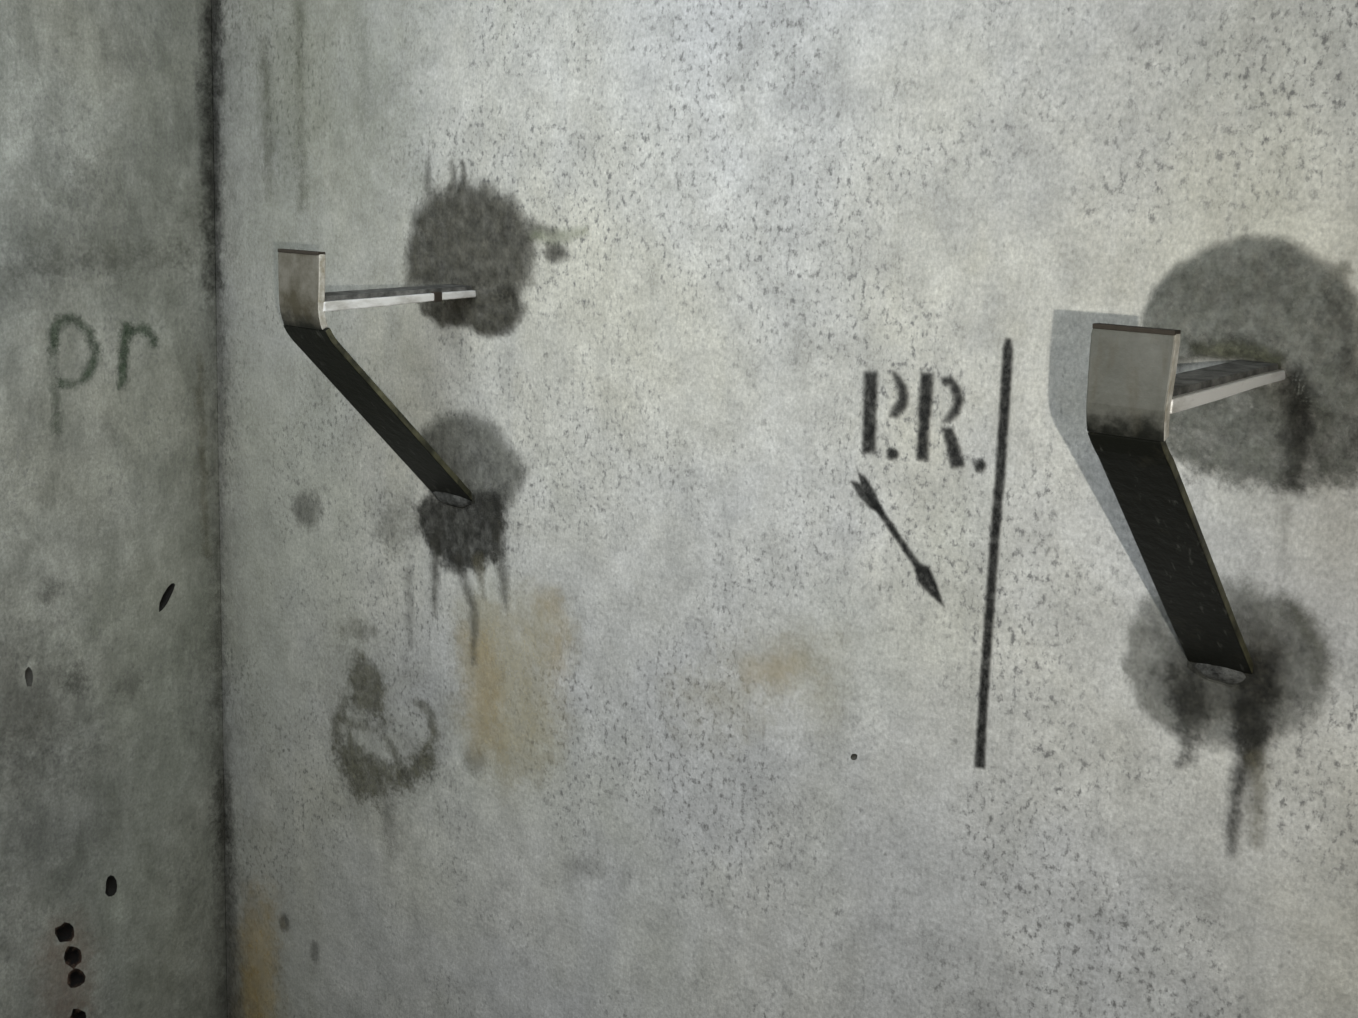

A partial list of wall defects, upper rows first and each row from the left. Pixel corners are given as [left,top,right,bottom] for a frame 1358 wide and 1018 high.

water stain [1191,341,1310,486]
water stain [349,654,383,717]
water stain [333,717,435,800]